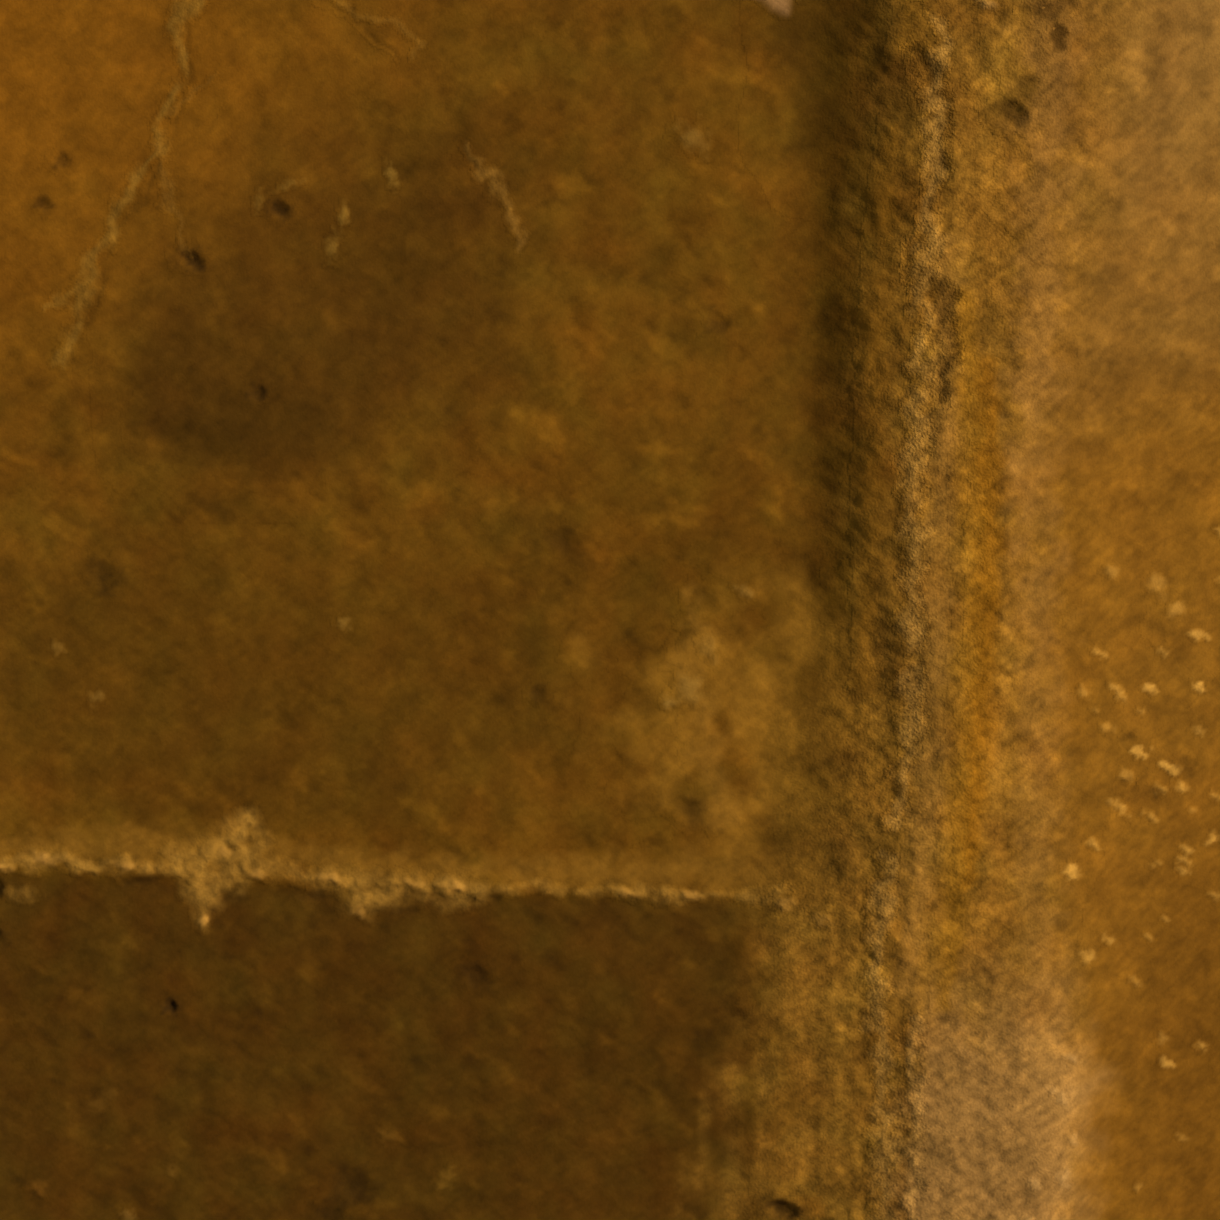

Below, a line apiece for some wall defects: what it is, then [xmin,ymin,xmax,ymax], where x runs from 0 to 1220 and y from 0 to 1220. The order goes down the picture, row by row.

spalling [743,0,810,20]
damp [0,81,683,852]